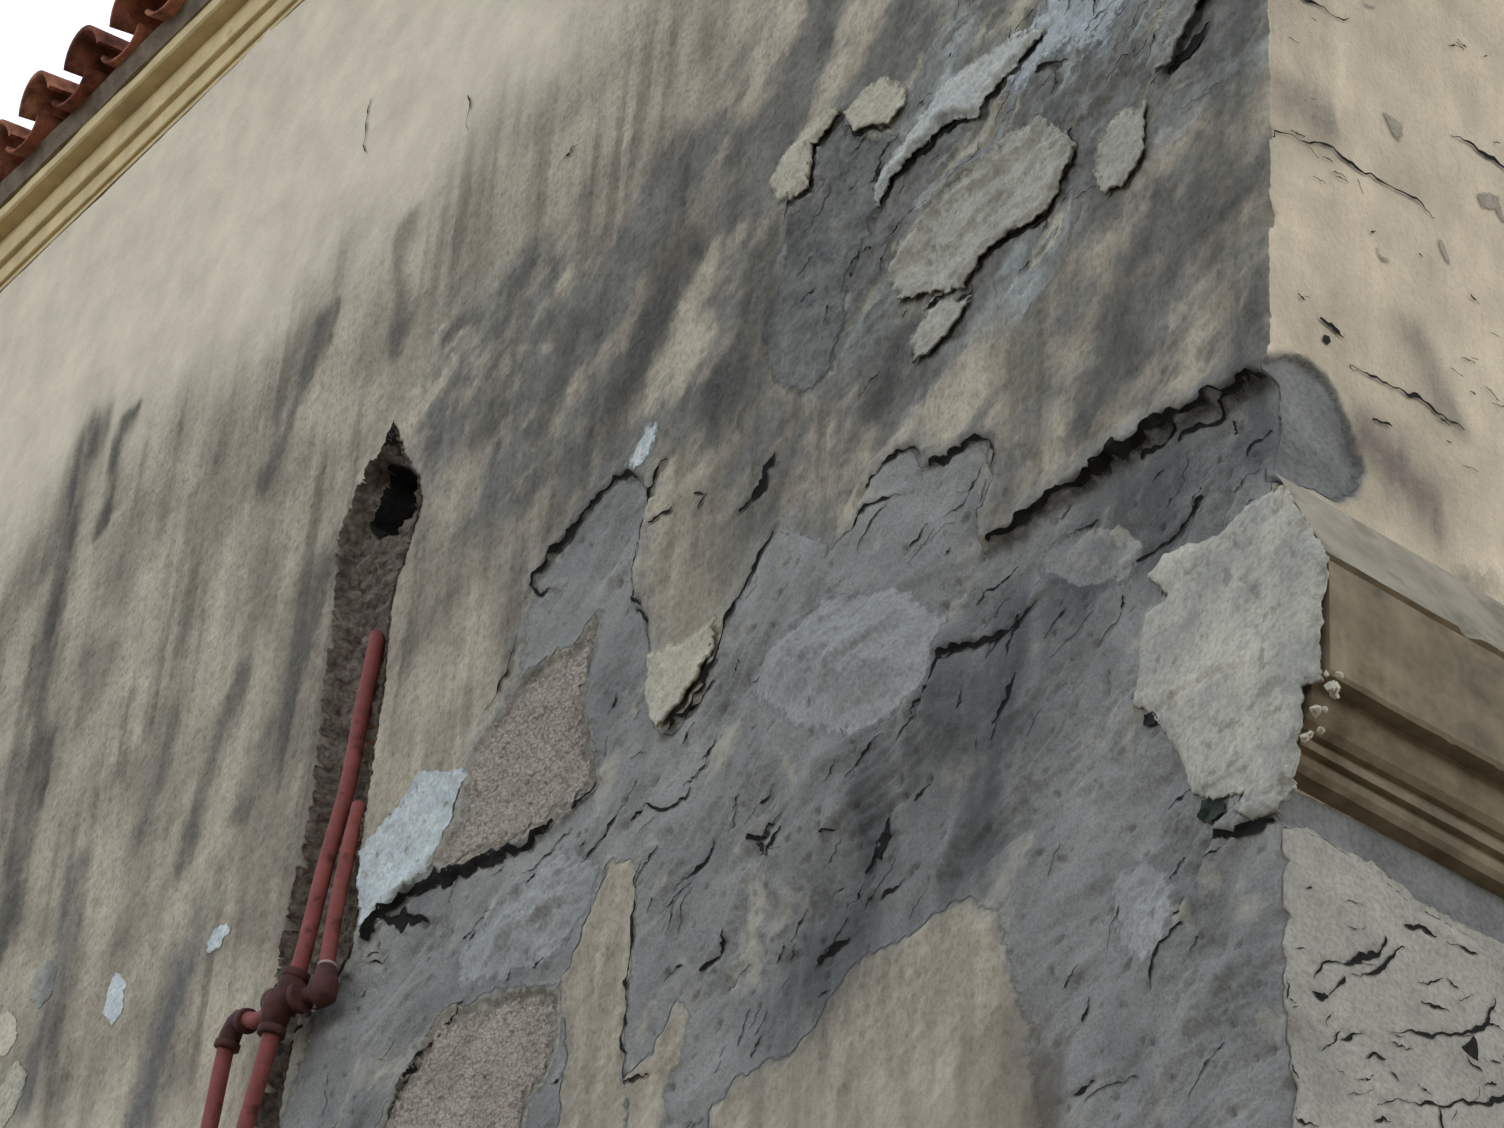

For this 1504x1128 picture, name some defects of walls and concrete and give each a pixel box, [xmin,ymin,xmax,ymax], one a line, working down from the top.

peeling [1154,0,1200,73]
crack [1290,0,1349,44]
peeling [761,27,1044,394]
peeling [887,112,1077,364]
crack [784,0,1224,355]
peeling [1094,100,1148,196]
crack [1272,130,1434,219]
crack [1452,136,1504,168]
crack [1298,293,1504,472]
spalling [279,354,1504,1128]
crack [1286,900,1504,1128]